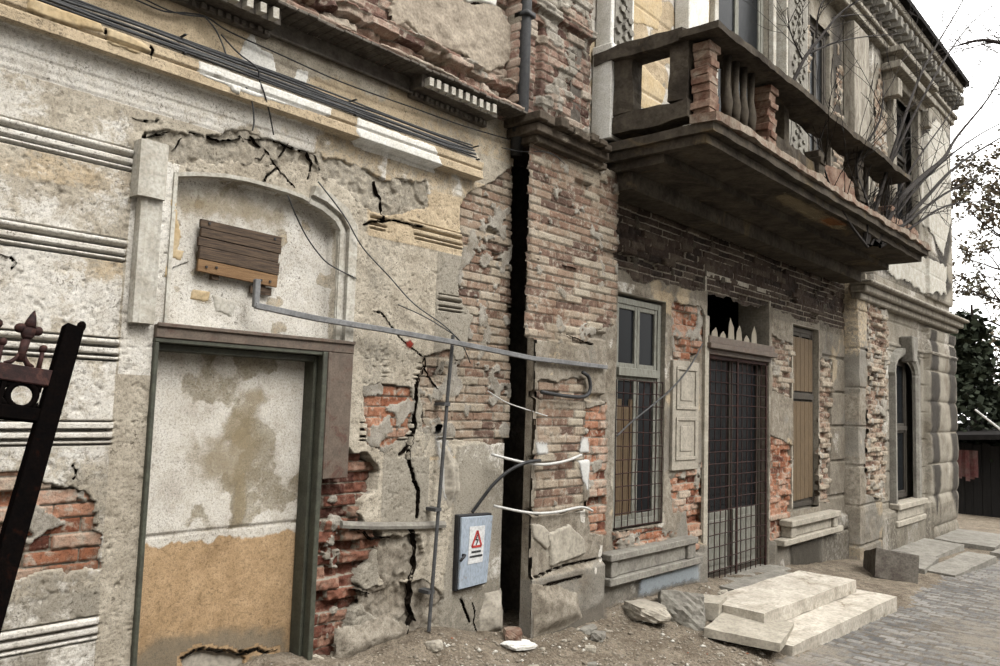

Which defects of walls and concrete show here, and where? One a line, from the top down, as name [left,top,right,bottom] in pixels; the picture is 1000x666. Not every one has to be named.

peeling [239,34,276,71]
peeling [197,61,332,117]
flaking render [281,0,598,134]
crack [132,117,320,188]
spalling [143,130,429,216]
flaking render [0,471,18,531]
flaking render [15,482,102,580]
water stain [206,390,264,521]
flaking render [313,167,513,656]
flaking render [530,378,702,567]
flaking render [768,436,794,541]
flaking render [863,303,890,500]